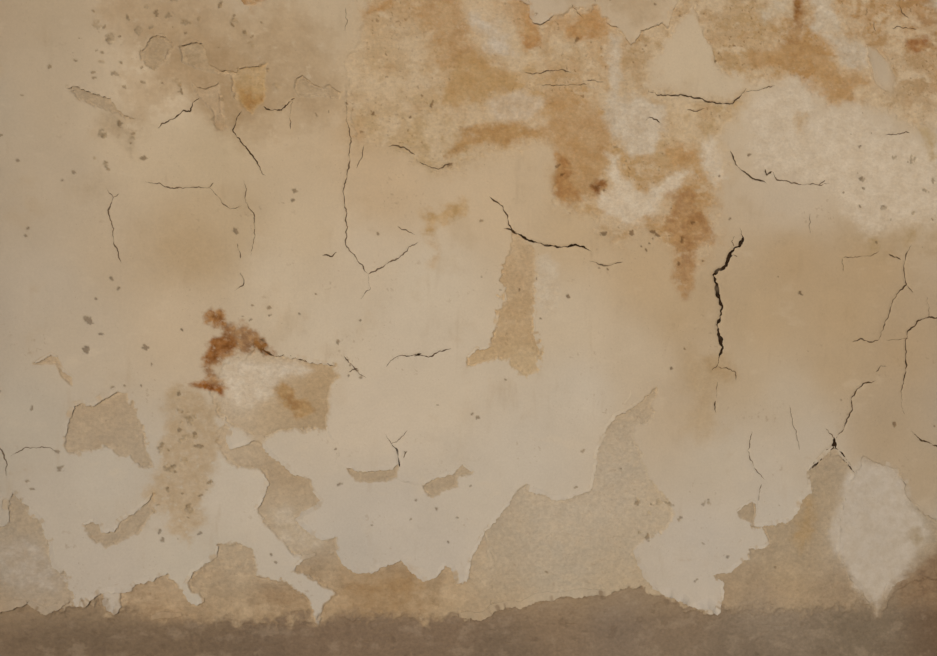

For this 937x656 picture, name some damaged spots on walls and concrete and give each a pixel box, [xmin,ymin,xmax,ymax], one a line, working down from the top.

rust [198,305,279,399]
crack [322,106,418,296]
peeling [343,0,546,178]
peeling [0,338,937,656]
peeling [465,229,546,382]
crack [490,197,621,266]
damp [552,0,689,234]
peeling [464,0,810,189]
crack [712,232,744,412]
crack [790,367,880,472]
damp [737,72,937,276]
damp [808,0,874,70]